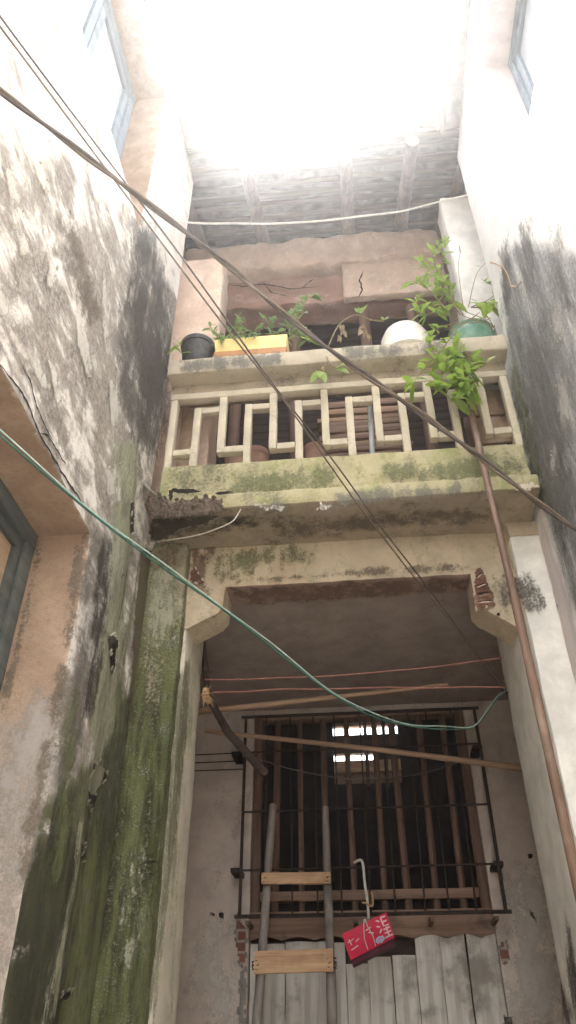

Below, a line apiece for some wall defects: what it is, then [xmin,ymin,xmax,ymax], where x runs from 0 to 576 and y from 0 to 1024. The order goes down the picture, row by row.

leakage [59,211,103,326]
crack [229,279,317,296]
leakage [214,219,573,582]
spalling [106,462,224,543]
leakage [169,516,258,537]
spalling [473,565,501,616]
leakage [493,572,546,612]
spalling [108,633,119,675]
leakage [124,547,182,759]
leakage [0,533,112,1024]
spalling [86,756,109,812]
leakage [124,660,190,1024]